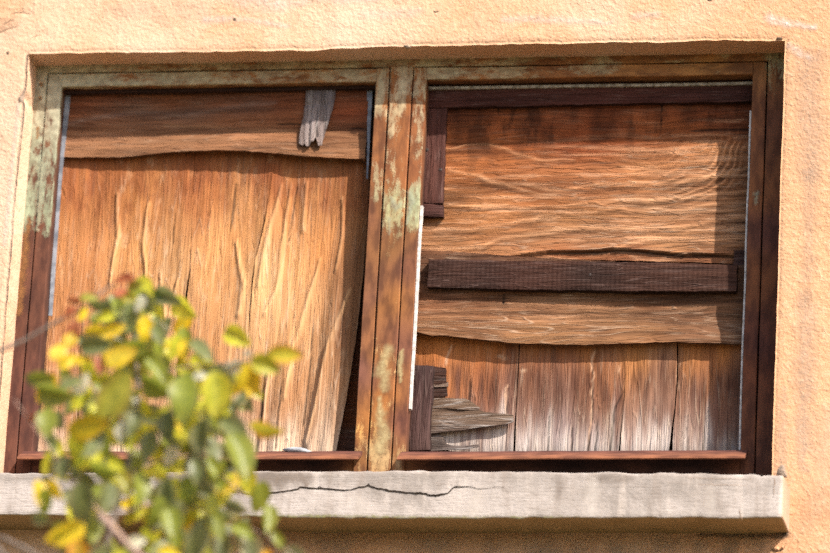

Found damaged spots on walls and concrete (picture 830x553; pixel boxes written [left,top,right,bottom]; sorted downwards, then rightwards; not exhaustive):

crack [271,484,501,496]